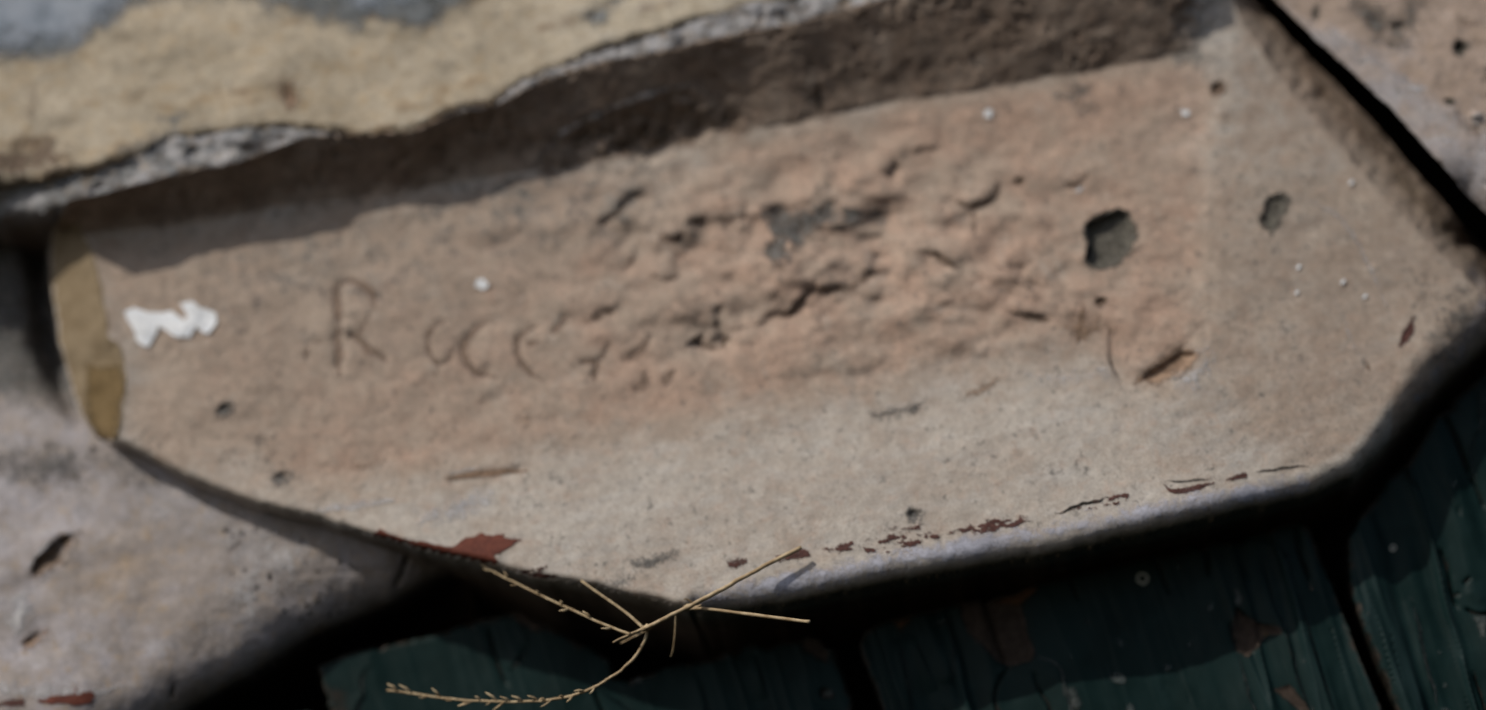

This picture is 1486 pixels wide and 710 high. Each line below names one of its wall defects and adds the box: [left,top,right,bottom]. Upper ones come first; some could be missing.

spalling [1082,208,1138,270]
peeling [1274,685,1309,710]